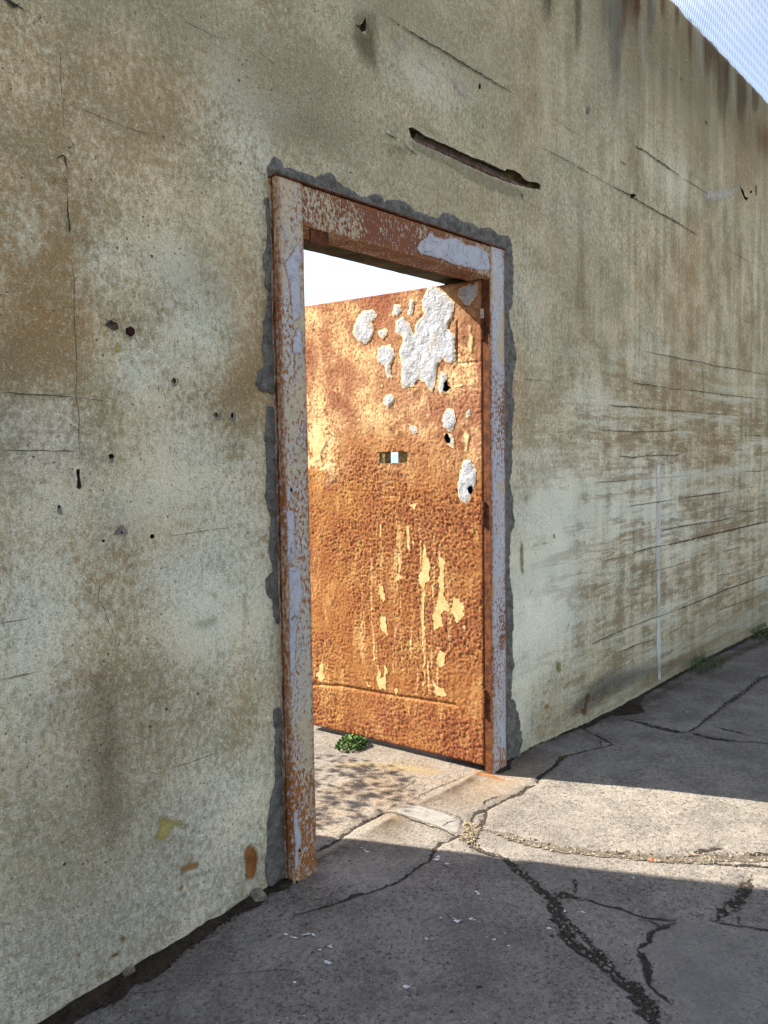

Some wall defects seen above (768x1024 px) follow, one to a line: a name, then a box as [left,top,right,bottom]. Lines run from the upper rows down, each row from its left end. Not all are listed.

crack [387,17,512,93]
water stain [704,36,757,100]
crack [53,52,148,234]
spalling [409,127,541,195]
crack [545,146,706,235]
crack [2,259,103,452]
crack [591,351,768,663]
corrosion [245,846,258,879]